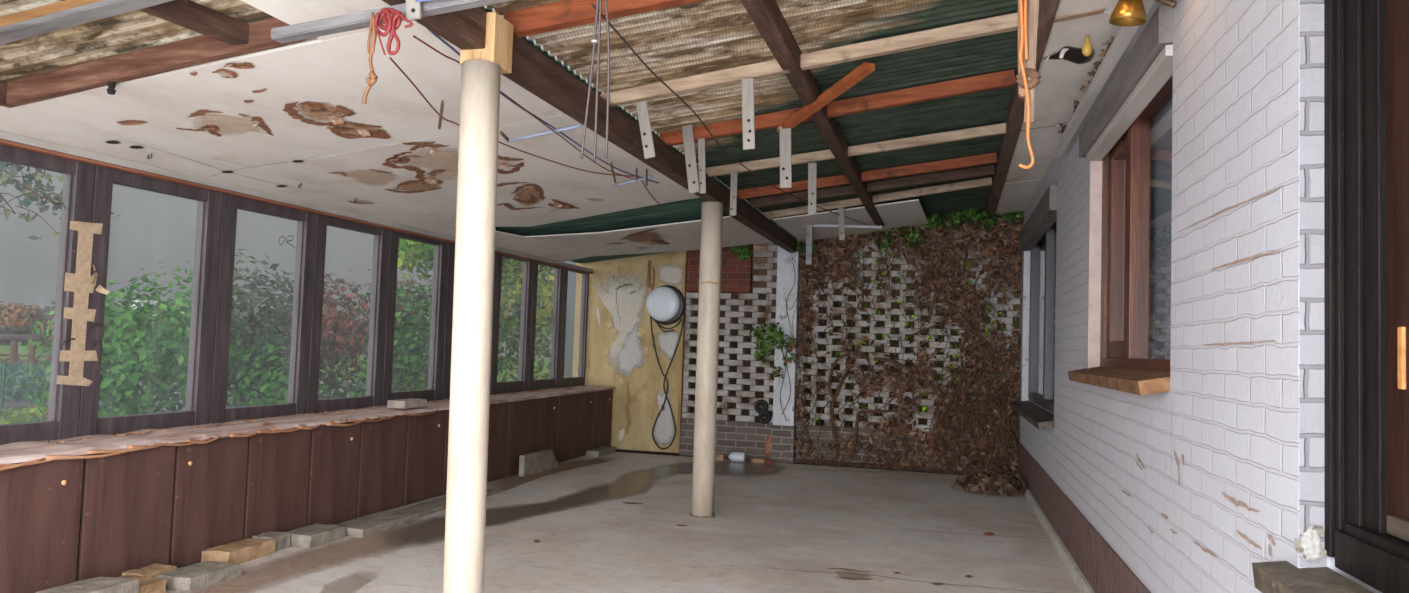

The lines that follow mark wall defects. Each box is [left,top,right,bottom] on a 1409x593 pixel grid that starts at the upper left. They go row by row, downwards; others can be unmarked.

peeling [594,265,683,384]
damp [715,460,780,475]
damp [486,459,693,526]
damp [394,517,446,544]
damp [323,576,369,593]